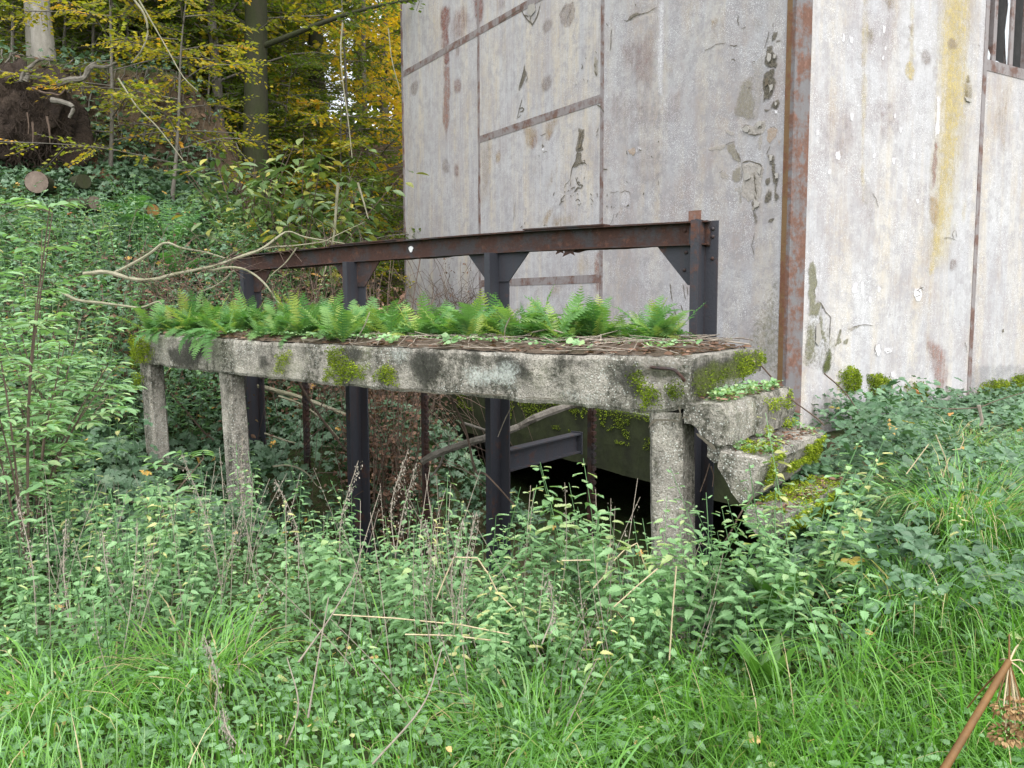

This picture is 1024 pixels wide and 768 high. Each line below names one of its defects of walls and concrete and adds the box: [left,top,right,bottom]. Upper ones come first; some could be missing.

rust [441,0,483,128]
spalling [553,129,598,205]
spalling [708,32,780,222]
leakage [935,0,967,255]